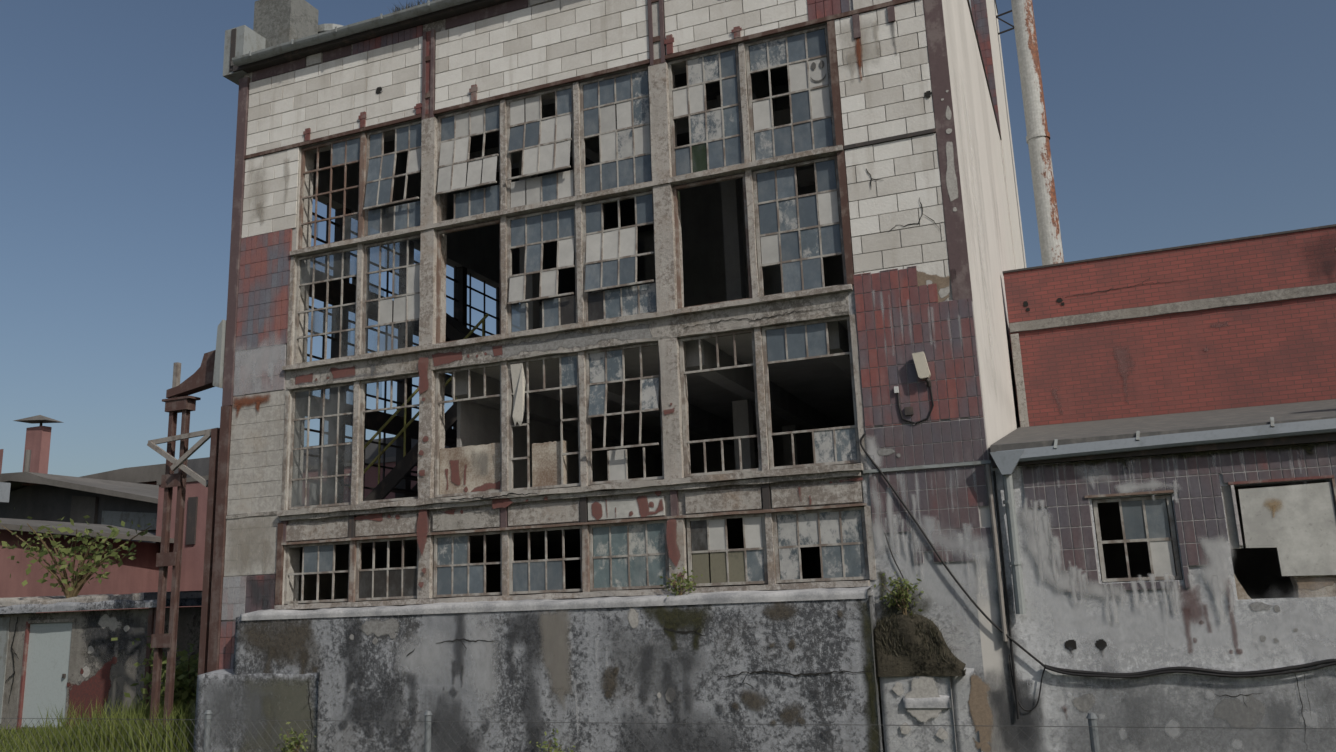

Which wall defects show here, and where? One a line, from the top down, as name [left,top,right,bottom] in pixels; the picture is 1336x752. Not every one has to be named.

spalling [1297,575,1336,590]
water stain [764,602,795,619]
spalling [1065,640,1077,653]
spalling [1095,639,1107,653]
water stain [339,622,416,748]
water stain [431,614,488,752]
water stain [508,611,570,752]
water stain [603,623,767,752]
water stain [770,688,821,726]
water stain [865,667,874,721]